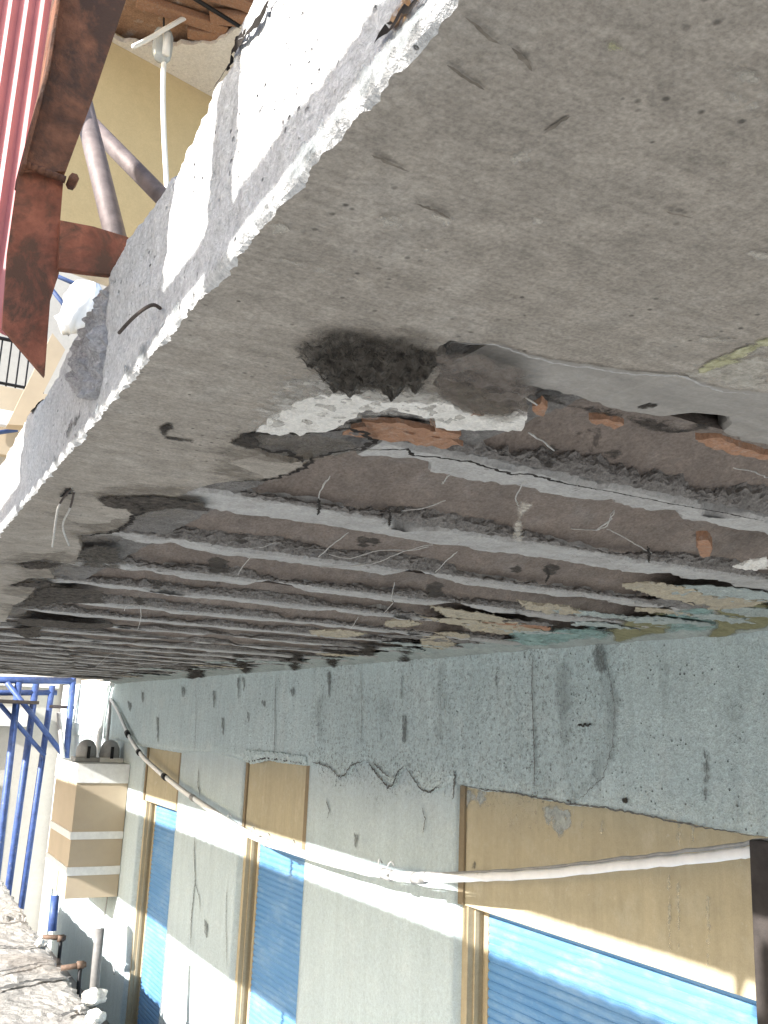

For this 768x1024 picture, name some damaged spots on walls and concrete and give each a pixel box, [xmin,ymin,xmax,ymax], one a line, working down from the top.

spalling [10,562,117,638]
spalling [51,487,121,569]
spalling [64,288,192,413]
spalling [99,496,209,514]
peeling [308,629,367,638]
spalling [253,377,548,457]
crack [230,428,763,521]
water stain [296,333,709,433]
peeling [429,581,768,673]
spalling [695,433,768,460]
peeling [732,557,768,571]
crack [313,647,763,837]